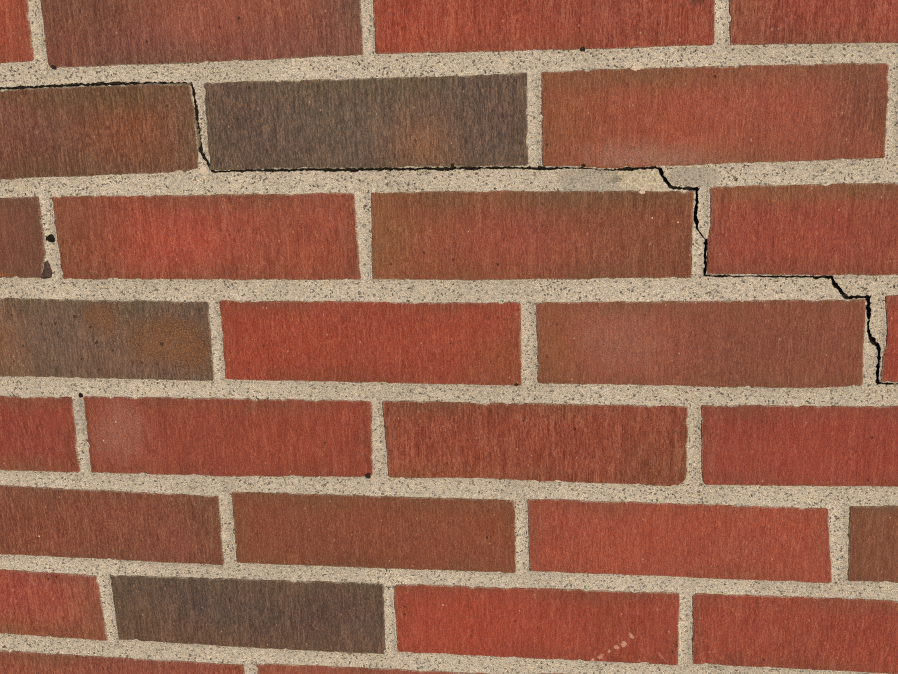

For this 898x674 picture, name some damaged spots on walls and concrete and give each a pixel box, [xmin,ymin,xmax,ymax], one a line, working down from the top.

crack [0,81,898,385]